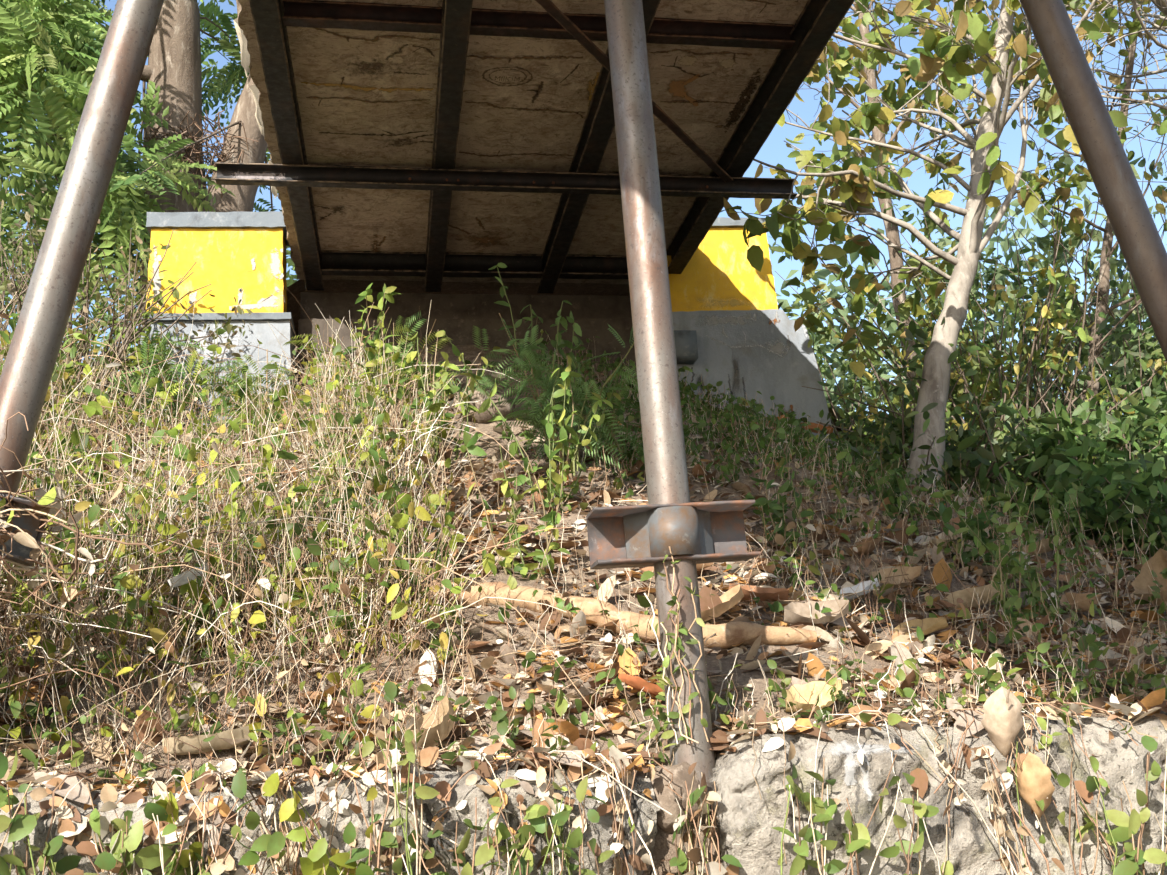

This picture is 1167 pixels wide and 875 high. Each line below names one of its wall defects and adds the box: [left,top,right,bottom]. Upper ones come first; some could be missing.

crack [315,28,440,57]
crack [301,77,434,136]
crack [465,55,586,118]
crack [651,49,752,104]
crack [459,150,573,158]
peeling [152,246,162,308]
peeling [229,248,284,310]